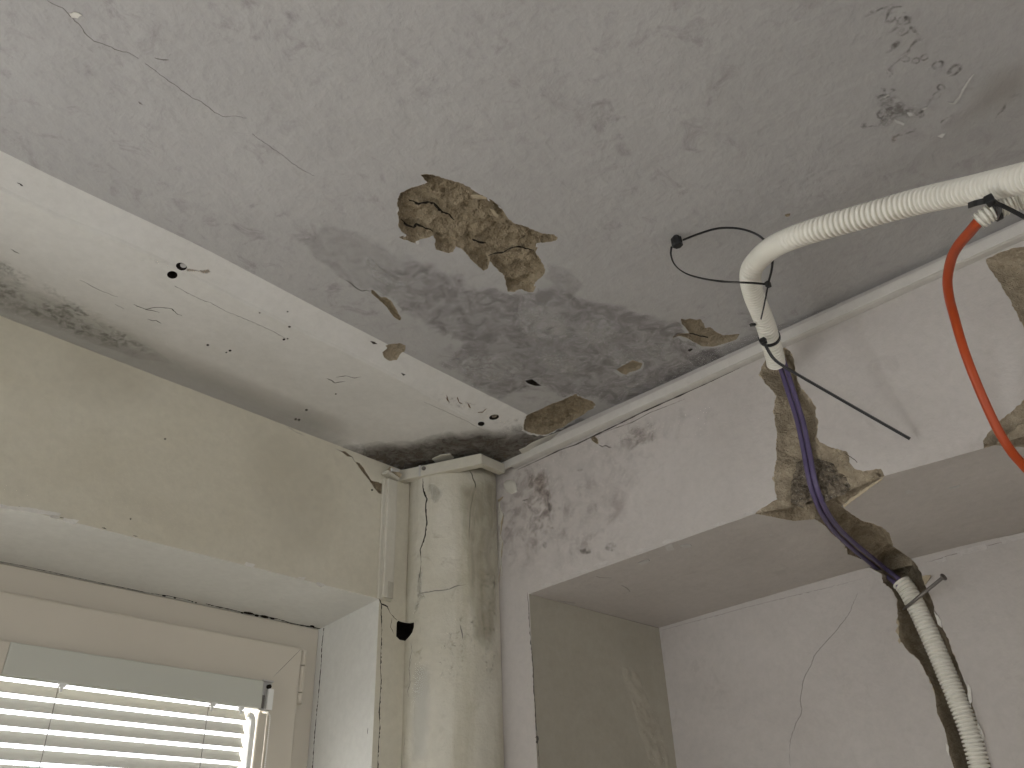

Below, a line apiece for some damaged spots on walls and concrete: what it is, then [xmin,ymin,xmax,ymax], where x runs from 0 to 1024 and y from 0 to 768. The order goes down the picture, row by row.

crack [47,0,243,118]
spalling [396,174,557,292]
spalling [346,280,401,320]
spalling [370,341,406,361]
spalling [673,318,739,352]
spalling [524,394,596,435]
leakage [360,426,568,470]
spalling [337,449,382,494]
flaking render [843,476,884,508]
crack [418,485,465,594]
spalling [396,621,414,641]